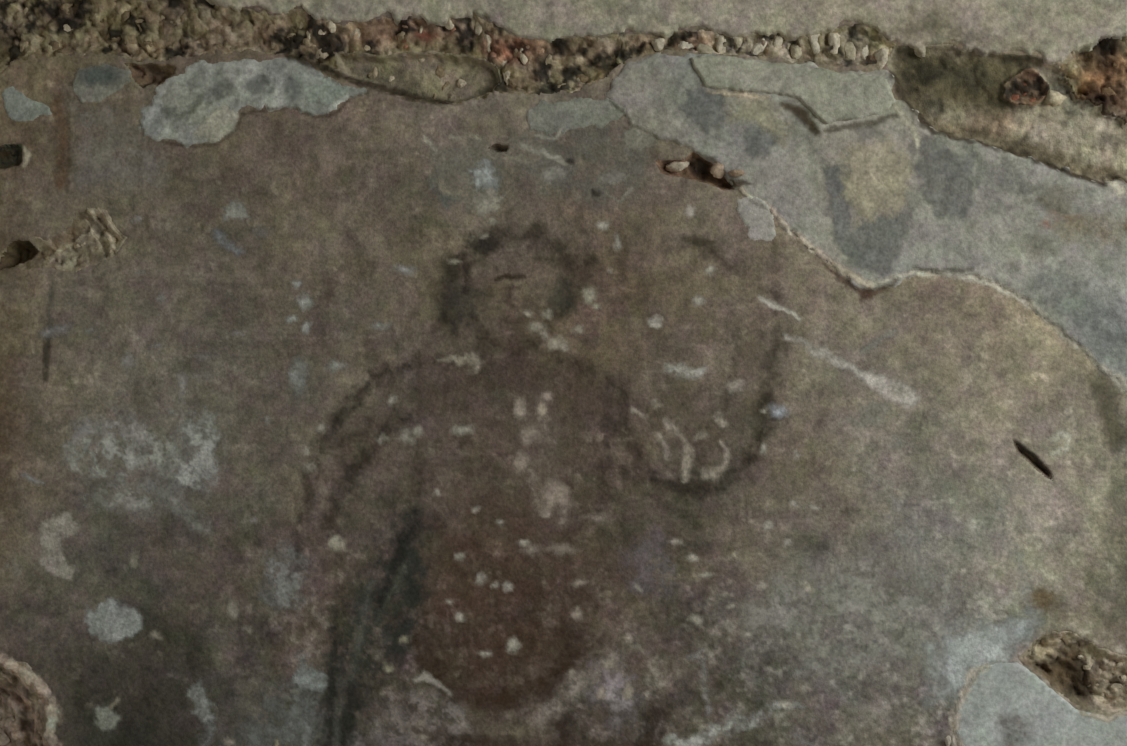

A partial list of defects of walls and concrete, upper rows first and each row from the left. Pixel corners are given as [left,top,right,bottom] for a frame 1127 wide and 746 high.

peeling [0,0,1127,397]
peeling [514,393,552,472]
peeling [657,418,729,482]
peeling [541,482,568,518]
peeling [520,540,538,554]
peeling [476,573,512,591]
peeling [508,638,520,652]
spalling [0,652,63,746]